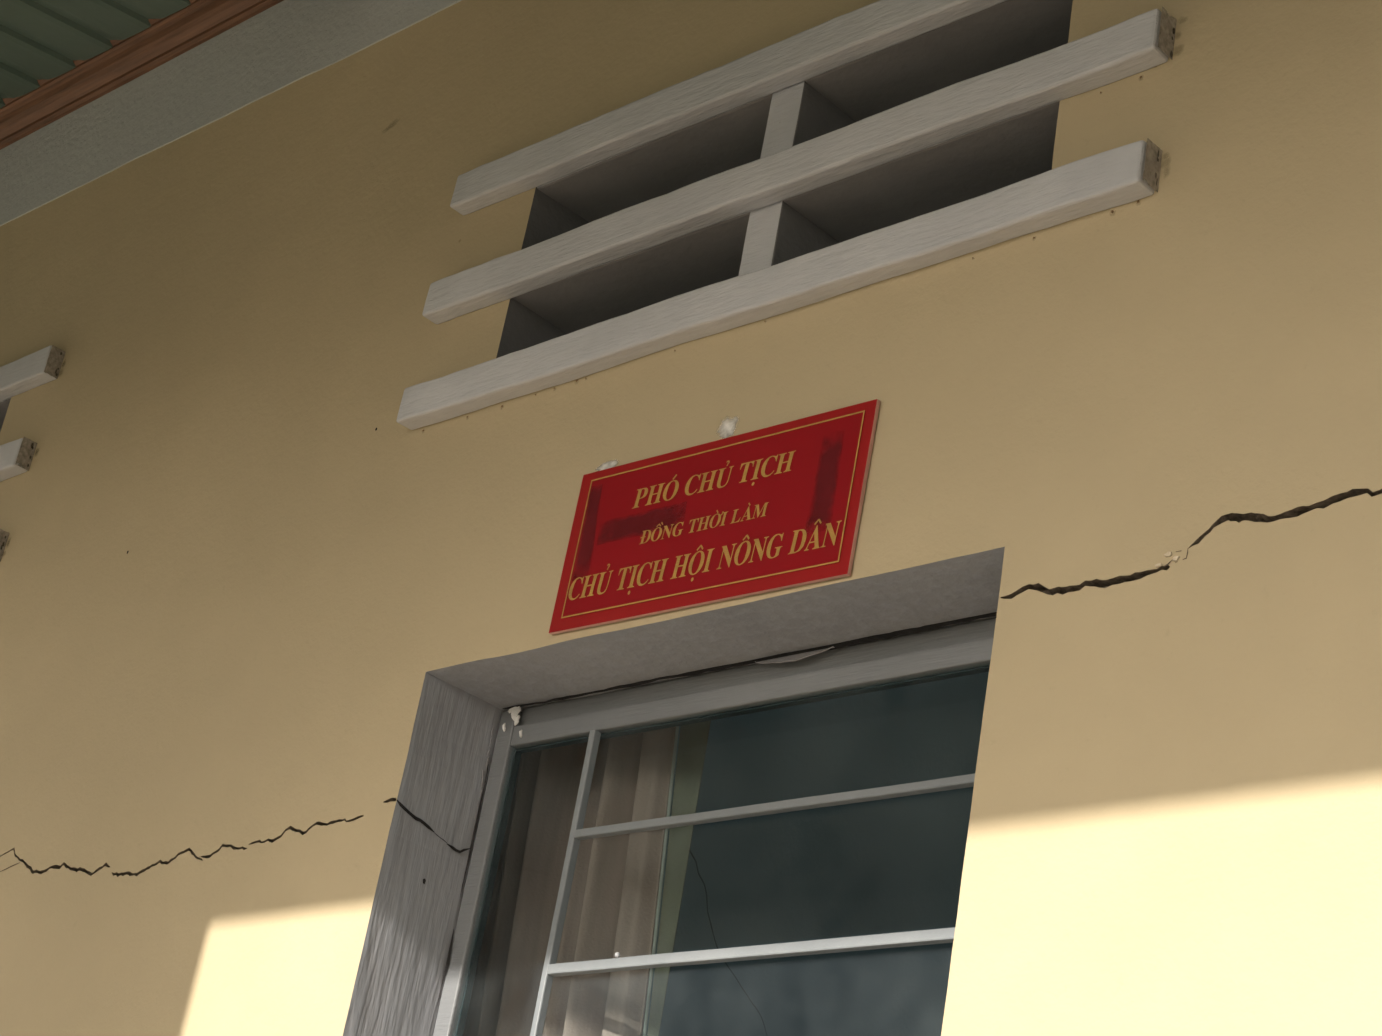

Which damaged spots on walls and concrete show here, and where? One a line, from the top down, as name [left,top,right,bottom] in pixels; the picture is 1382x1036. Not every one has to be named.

crack [503,488,1382,709]
crack [0,757,490,896]
crack [437,930,454,1004]